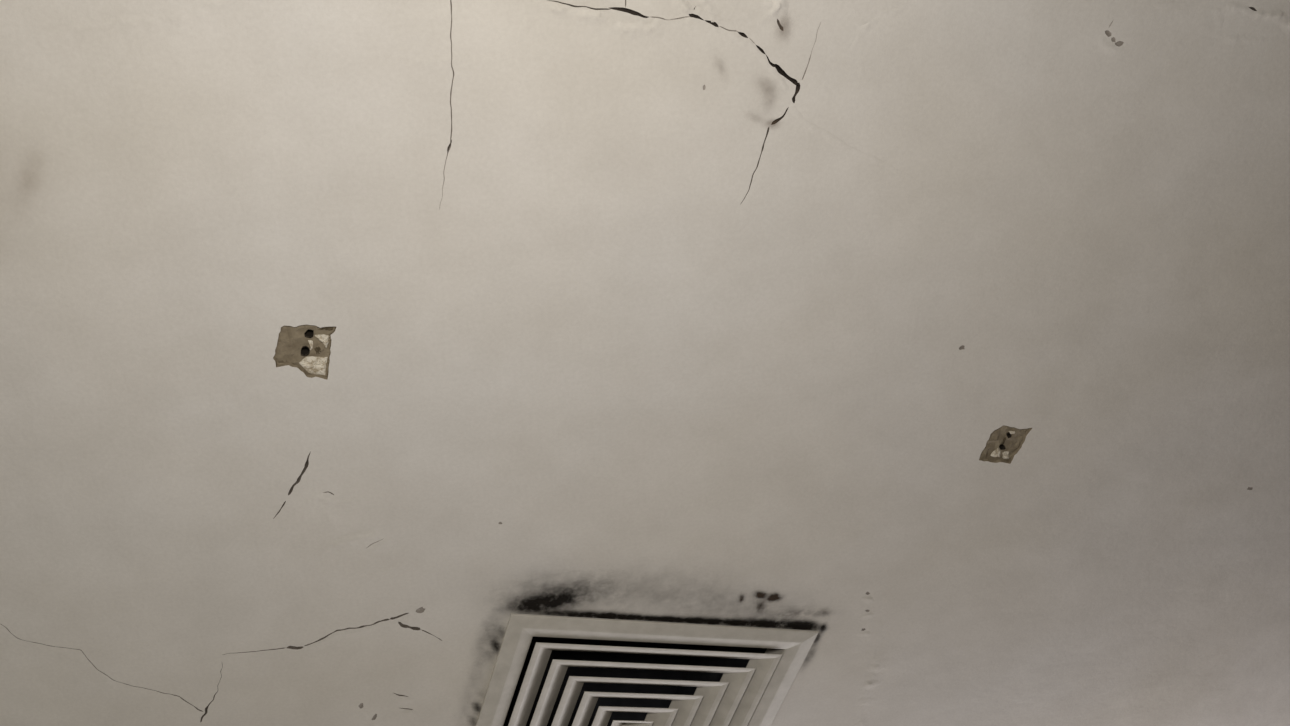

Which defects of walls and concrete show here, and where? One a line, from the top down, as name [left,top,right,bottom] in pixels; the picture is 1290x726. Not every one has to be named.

crack [405,0,916,210]
crack [261,451,311,518]
crack [223,607,442,655]
damp [514,588,826,643]